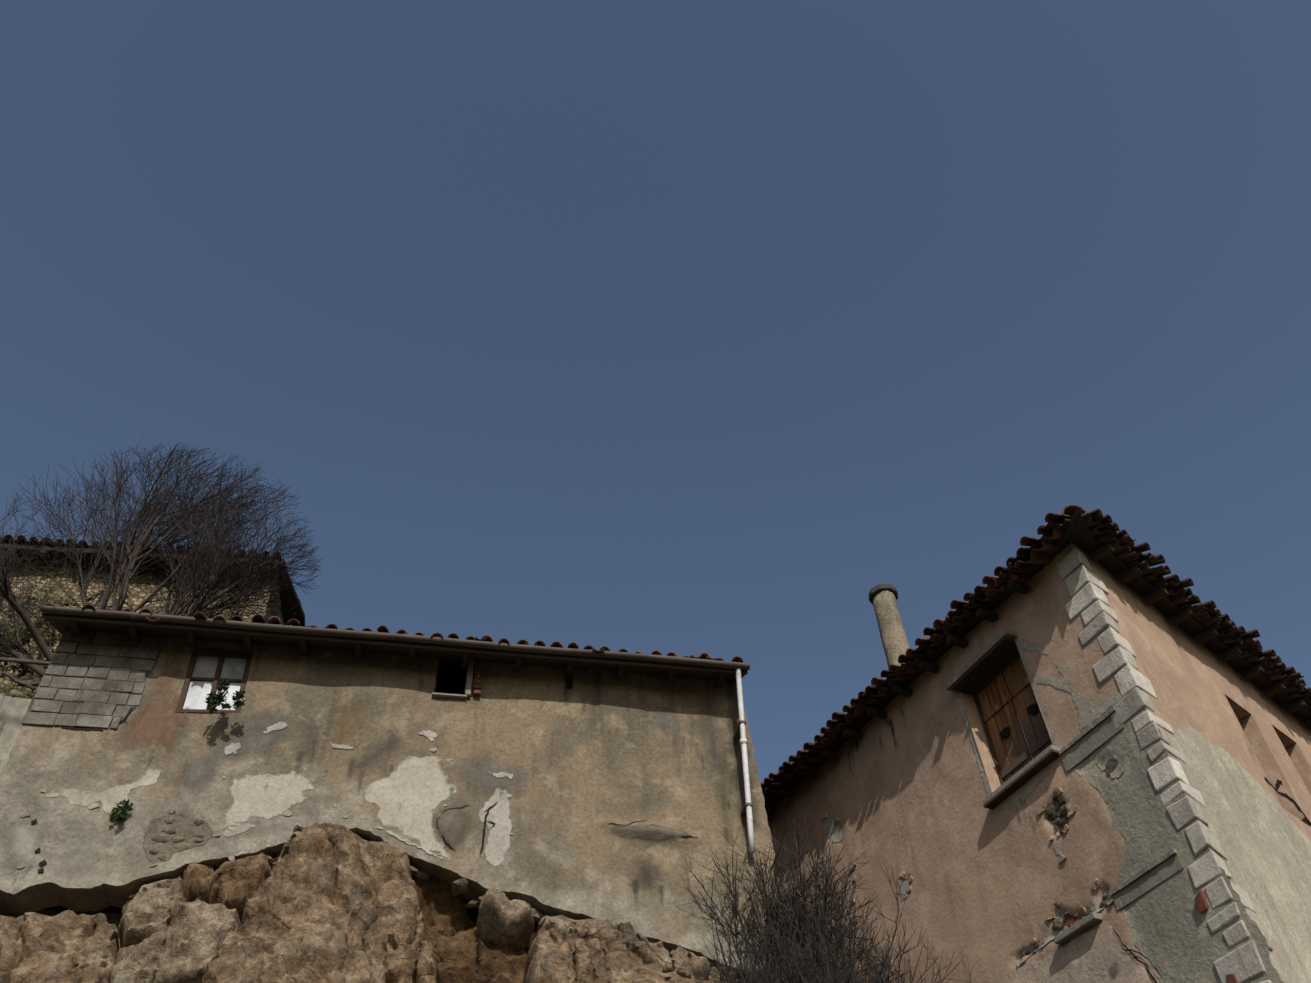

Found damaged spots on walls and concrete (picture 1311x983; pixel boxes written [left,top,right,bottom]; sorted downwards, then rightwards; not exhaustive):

flaking render [263,721,287,734]
flaking render [143,771,314,867]
flaking render [364,730,456,860]
flaking render [478,771,514,866]
flaking render [1001,707,1311,983]
crack [1113,929,1162,983]